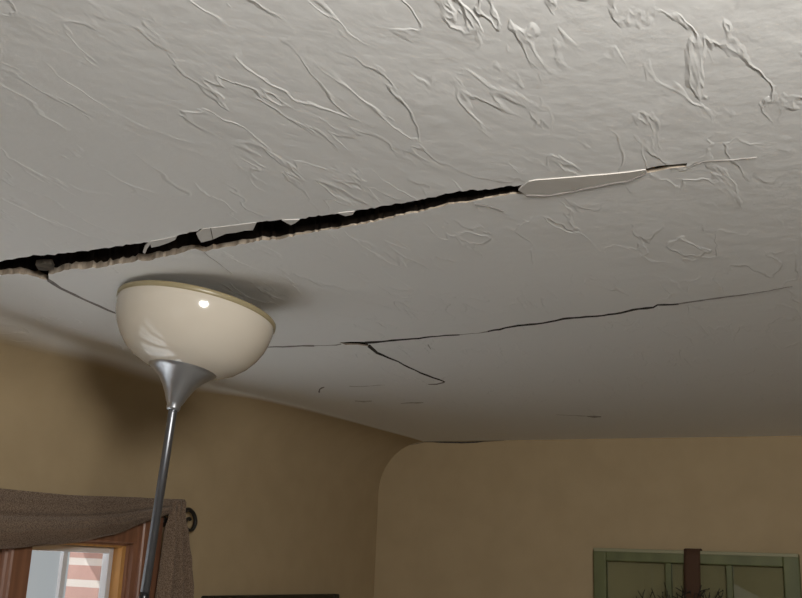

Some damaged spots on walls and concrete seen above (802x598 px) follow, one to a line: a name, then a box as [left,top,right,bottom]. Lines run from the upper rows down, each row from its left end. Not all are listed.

crack [0,157,757,314]
crack [268,286,792,385]